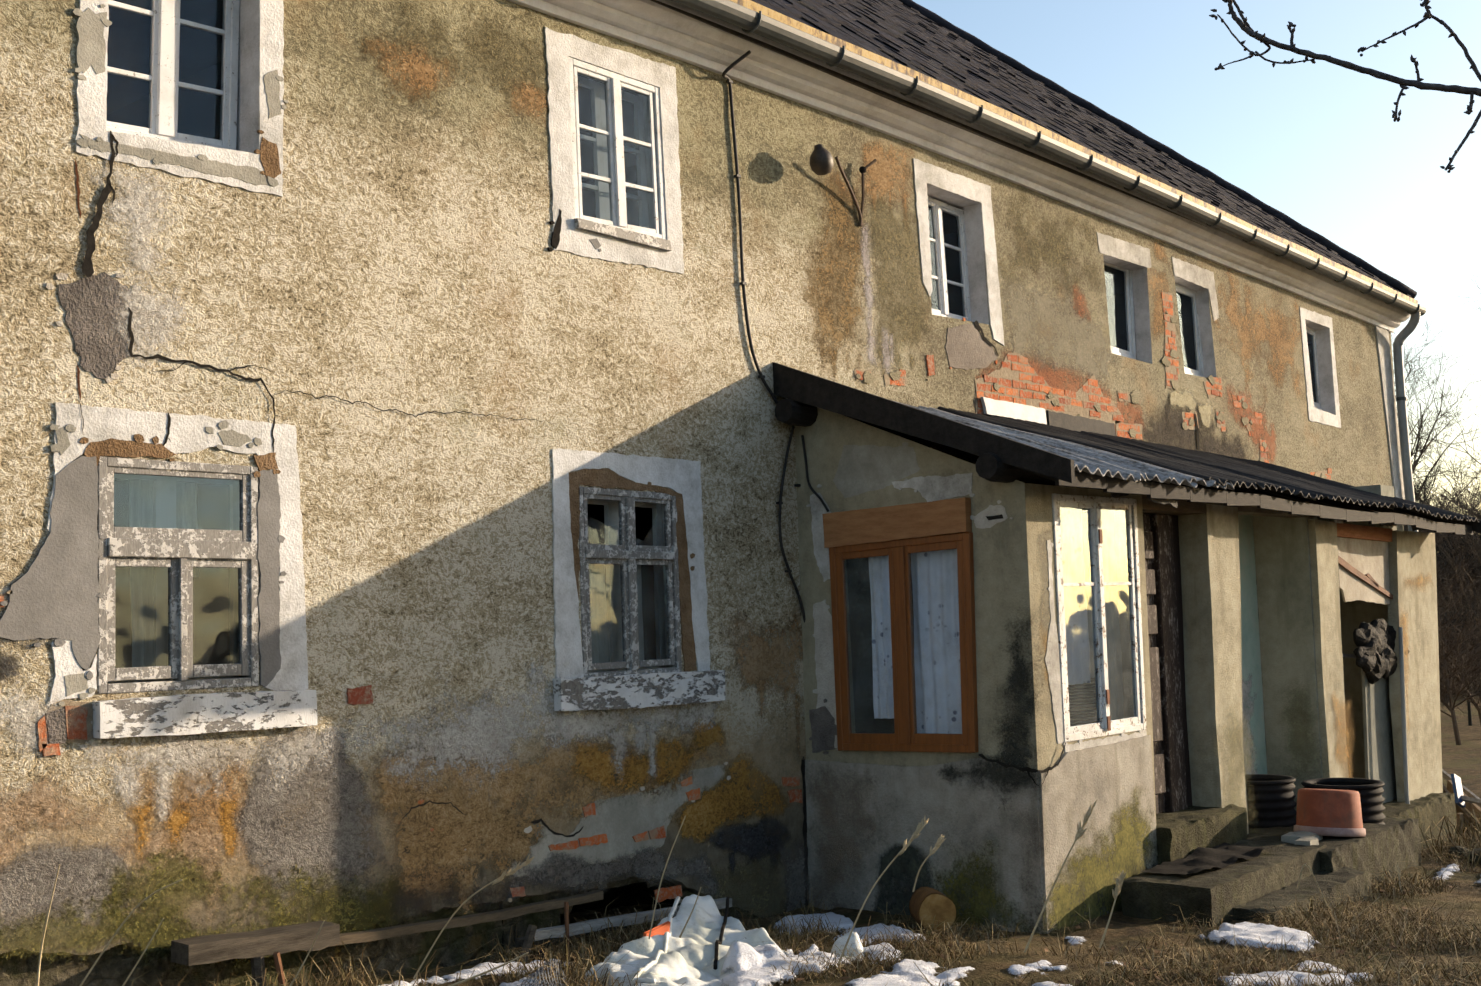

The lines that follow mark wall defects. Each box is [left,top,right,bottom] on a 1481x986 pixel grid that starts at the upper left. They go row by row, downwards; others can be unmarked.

crack [76,365,84,431]
spalling [45,272,141,383]
crack [75,131,119,277]
spalling [49,424,176,466]
peeling [205,420,281,477]
crack [128,307,561,452]
leakage [804,174,931,377]
flaking render [926,317,1143,440]
spalling [569,468,697,672]
leakage [0,681,57,747]
leakage [941,617,1043,800]
flaking render [370,720,803,914]